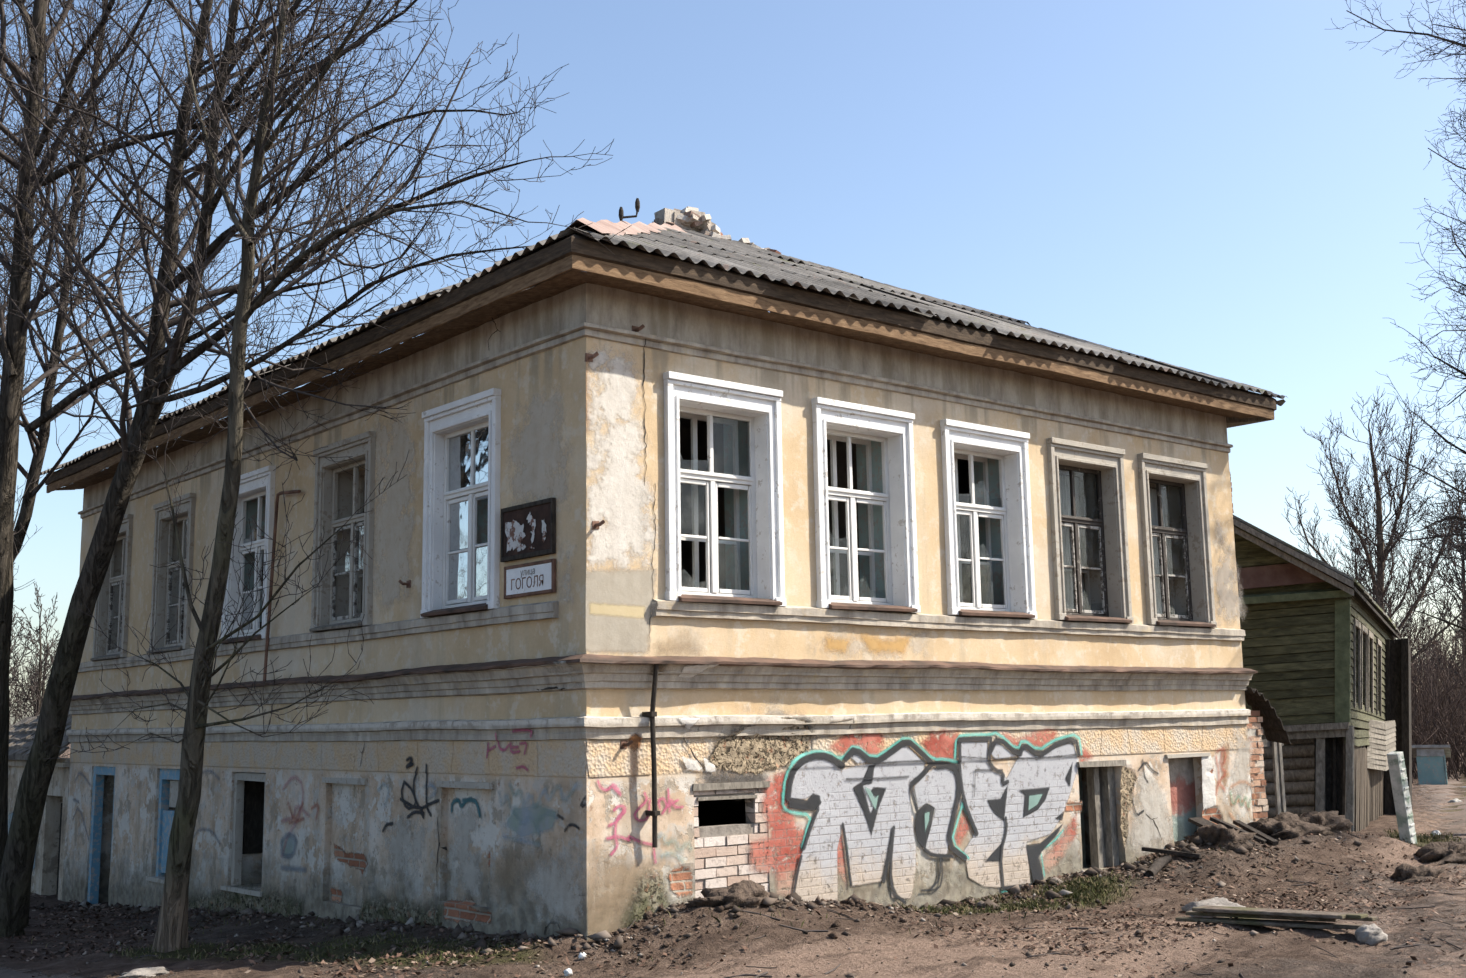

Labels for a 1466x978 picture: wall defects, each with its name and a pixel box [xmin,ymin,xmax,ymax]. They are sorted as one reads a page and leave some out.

peeling [505,393,567,551]
peeling [587,351,657,568]
flaking render [679,709,855,775]
flaking render [1202,806,1224,824]
flaking render [334,844,368,874]
flaking render [358,898,491,926]